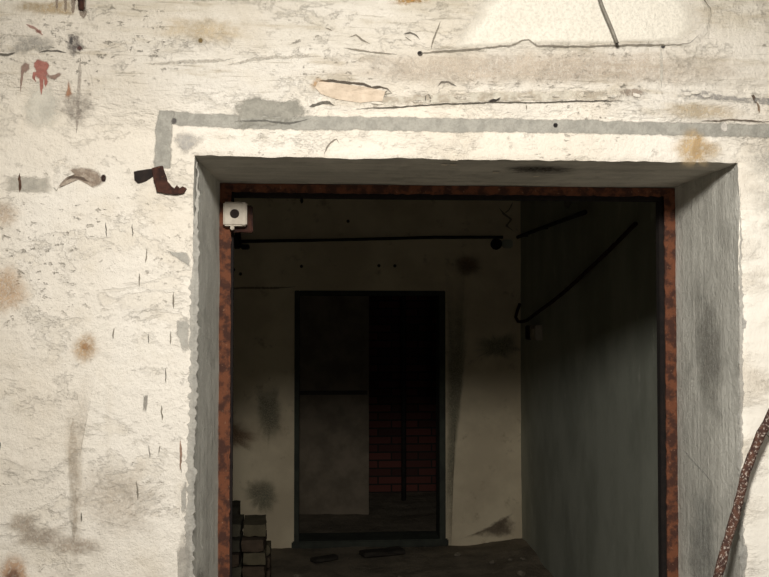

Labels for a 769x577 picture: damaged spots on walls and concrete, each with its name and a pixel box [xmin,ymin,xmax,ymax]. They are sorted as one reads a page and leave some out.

corrosion [23,0,87,18]
corrosion [2,561,25,577]